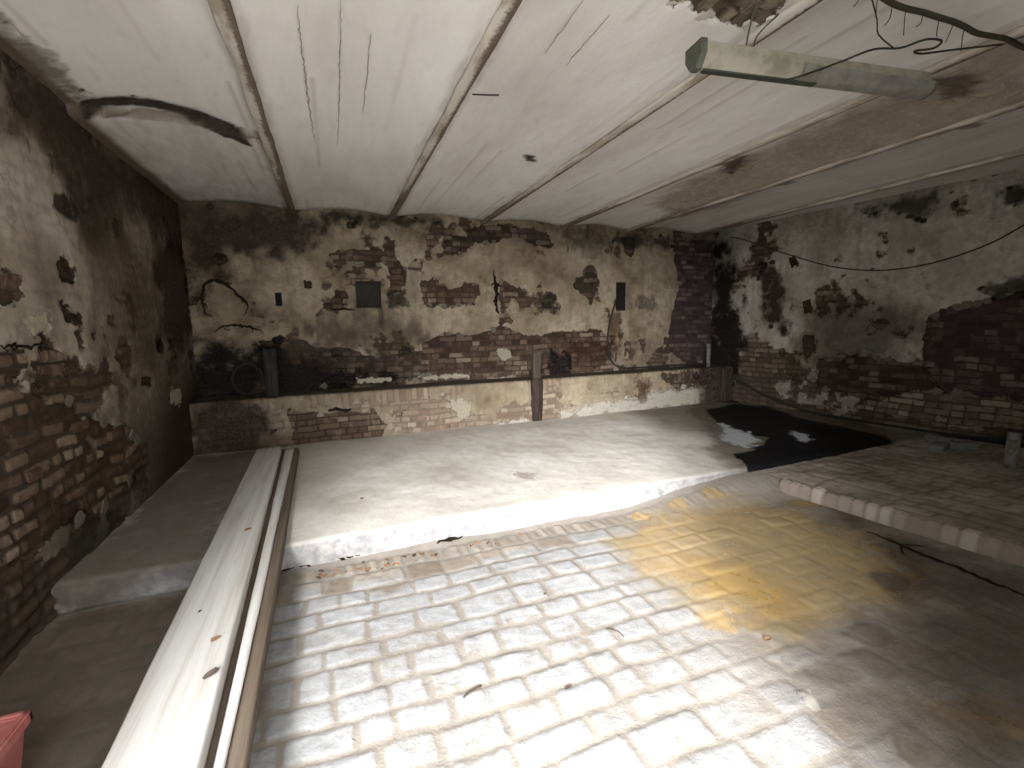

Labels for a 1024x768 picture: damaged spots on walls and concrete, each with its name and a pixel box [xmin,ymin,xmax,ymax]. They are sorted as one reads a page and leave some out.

crack [297,0,371,146]
flaking render [666,0,786,32]
water stain [0,38,443,366]
flaking render [0,267,141,568]
crack [200,278,264,334]
flaking render [260,277,617,389]
crack [491,270,500,314]
water stain [560,260,915,472]
flaking render [802,295,1024,433]
water stain [976,276,1024,300]
water stain [614,488,1024,768]
crack [867,532,1024,596]